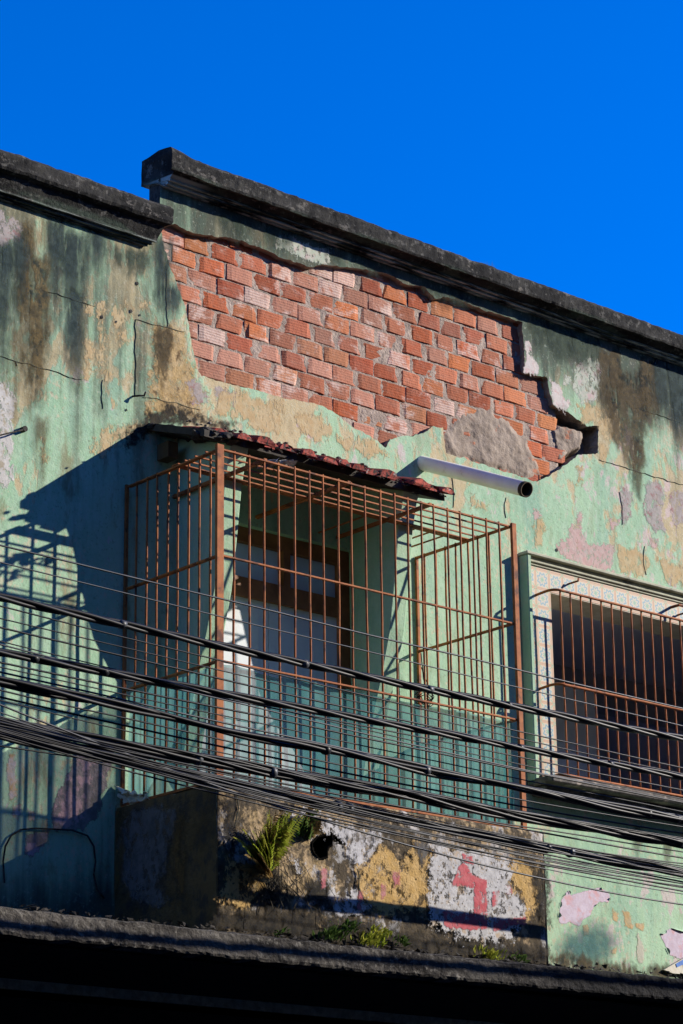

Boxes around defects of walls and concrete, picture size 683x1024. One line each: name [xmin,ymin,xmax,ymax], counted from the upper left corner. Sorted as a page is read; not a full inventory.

water stain [0,221,181,396]
crack [0,356,103,405]
flaking render [81,226,622,486]
water stain [529,316,683,498]
peeling [533,508,546,546]
peeling [556,480,683,587]
crack [600,460,683,525]
peeling [290,806,433,919]
peeling [508,855,539,921]
peeling [558,887,644,963]
peeling [661,928,683,959]